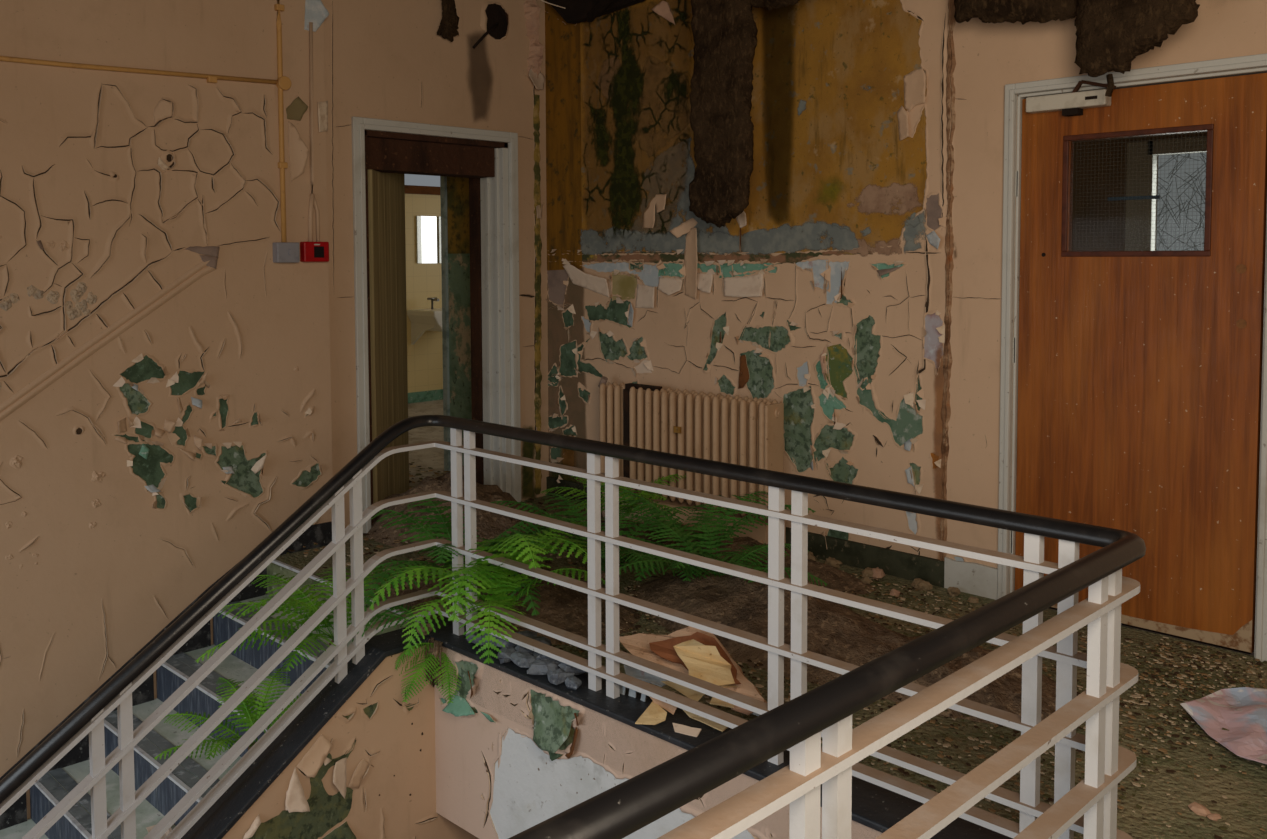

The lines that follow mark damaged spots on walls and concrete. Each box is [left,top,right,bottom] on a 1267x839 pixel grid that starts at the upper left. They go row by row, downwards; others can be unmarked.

spalling [473,1,509,49]
peeling [533,0,956,500]
peeling [821,529,851,548]
peeling [904,511,923,536]
spalling [940,518,969,562]